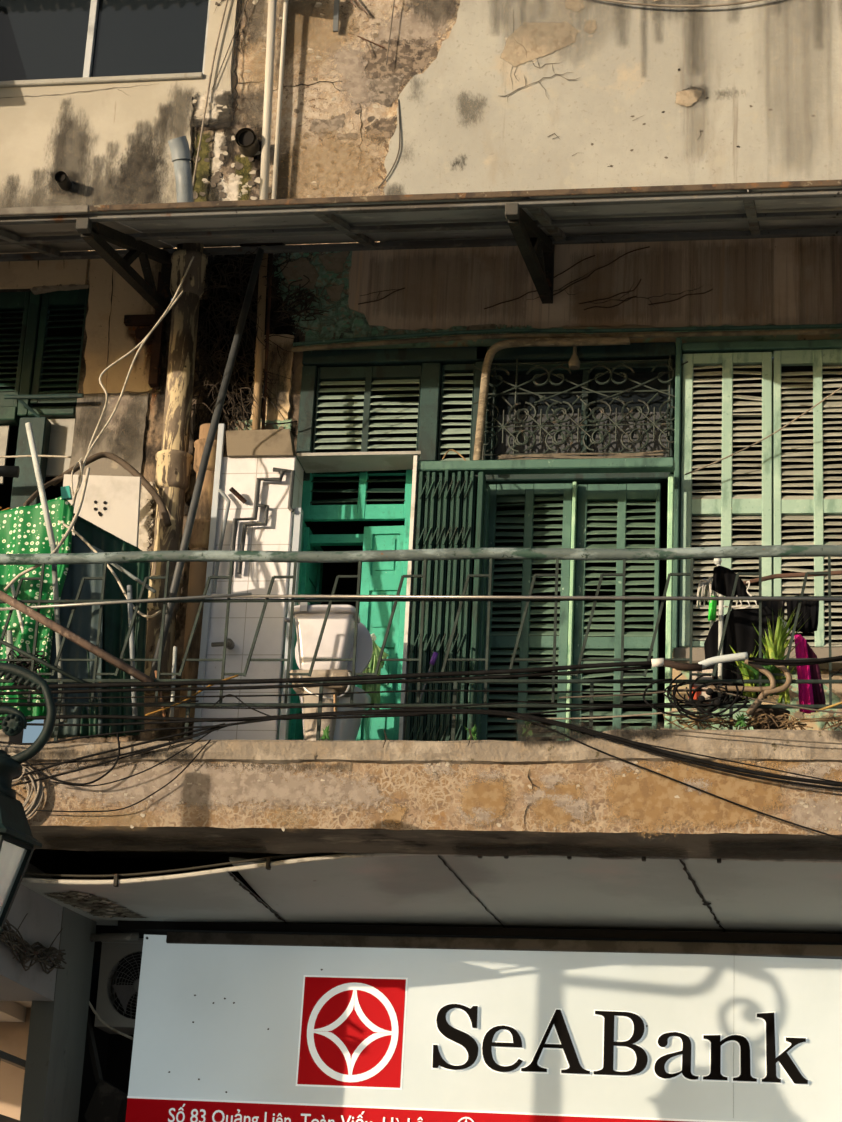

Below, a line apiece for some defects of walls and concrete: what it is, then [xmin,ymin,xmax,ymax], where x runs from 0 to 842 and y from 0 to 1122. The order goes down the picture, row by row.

crack [505,10,578,101]
peeling [500,19,597,67]
flaking render [190,0,460,202]
leakage [0,90,191,208]
leakage [235,156,250,200]
peeling [273,251,512,343]
leakage [710,841,842,861]
crack [437,855,505,928]
crack [679,859,725,932]